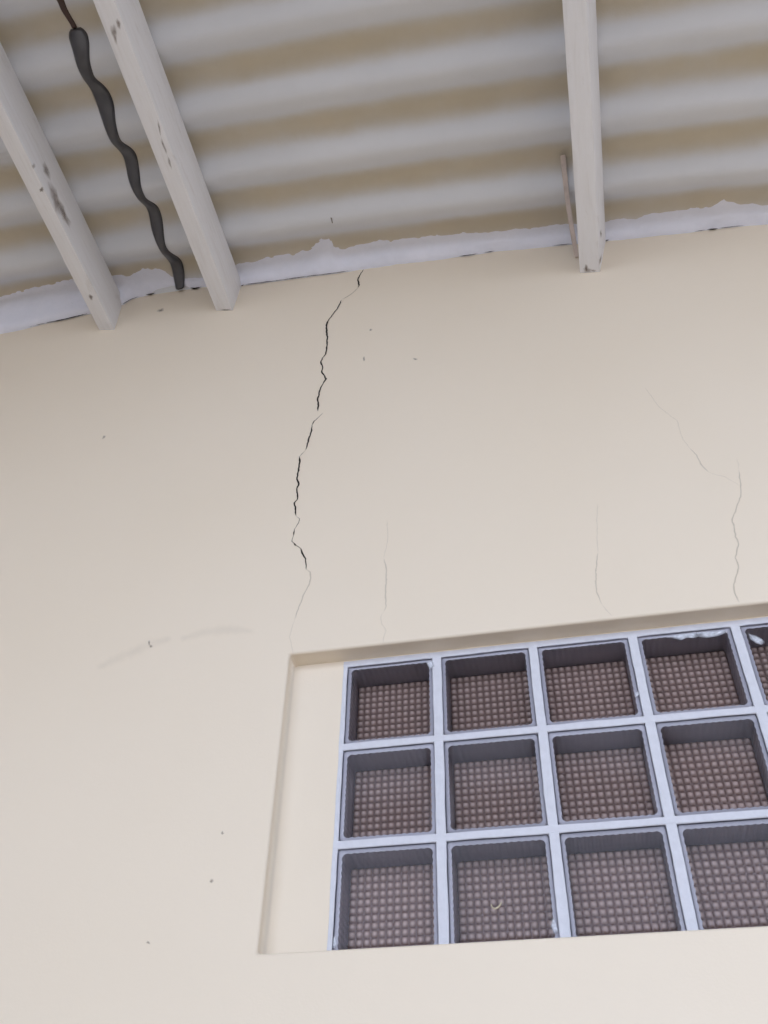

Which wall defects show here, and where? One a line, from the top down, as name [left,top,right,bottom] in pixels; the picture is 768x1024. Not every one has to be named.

crack [241,270,363,567]